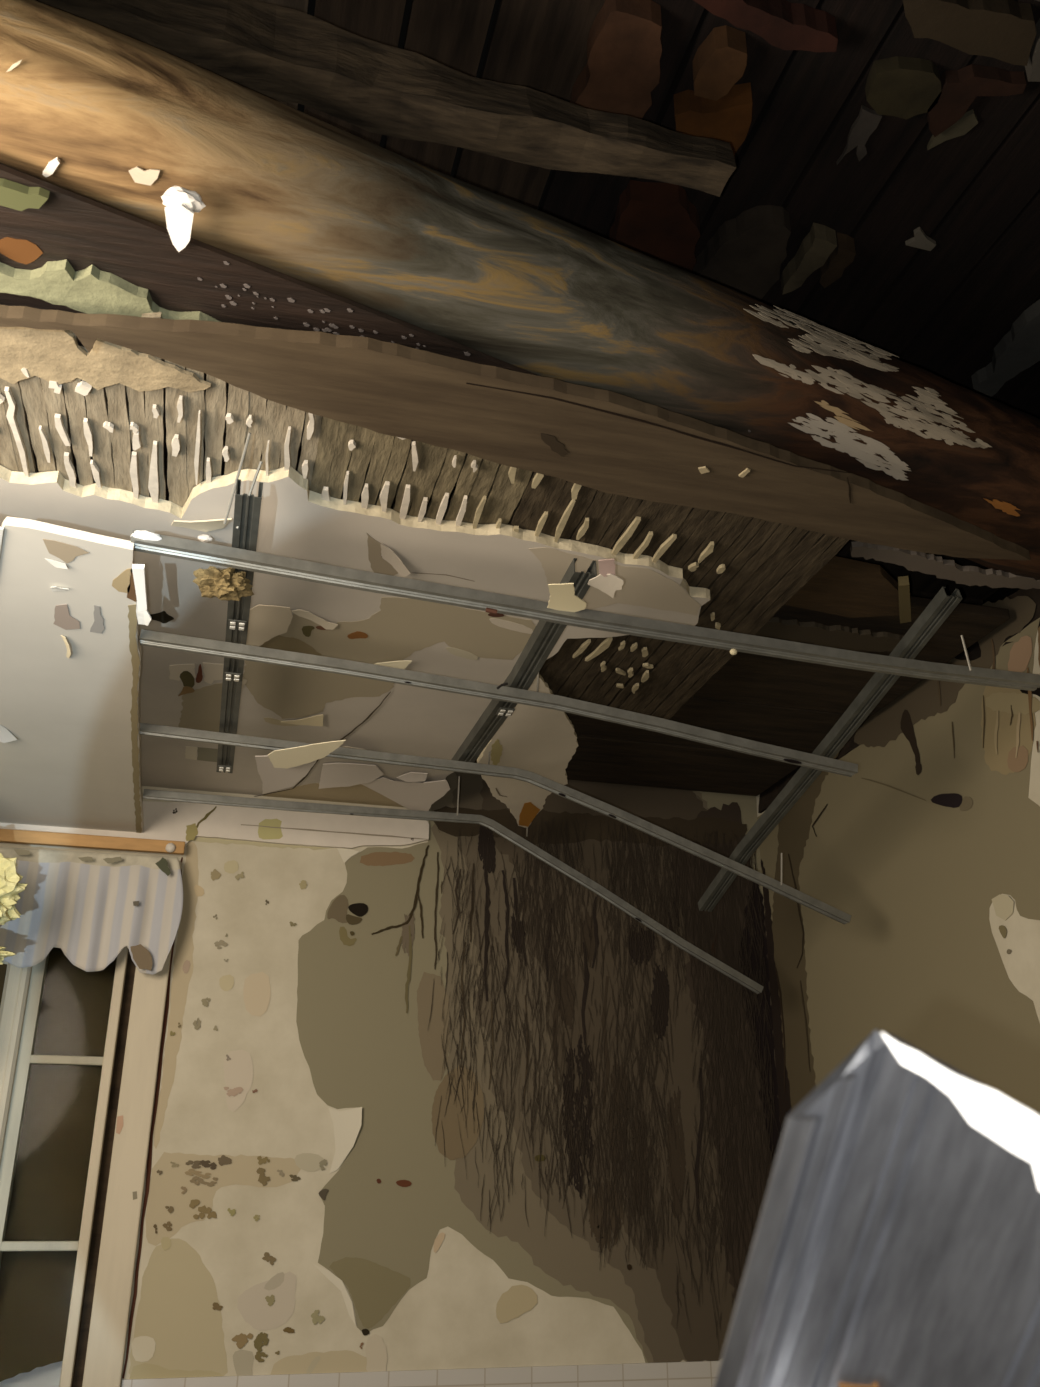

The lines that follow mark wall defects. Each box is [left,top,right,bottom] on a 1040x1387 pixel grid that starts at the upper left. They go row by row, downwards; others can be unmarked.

spalling [43,157,60,177]
peeling [129,166,206,252]
peeling [744,304,991,480]
spalling [132,564,151,626]
spalling [130,530,162,541]
water stain [489,618,533,634]
peeling [529,547,701,616]
water stain [946,596,1040,775]
water stain [128,808,415,1379]
peeling [243,597,648,1363]
water stain [395,679,966,1363]
peeling [798,684,1040,1115]